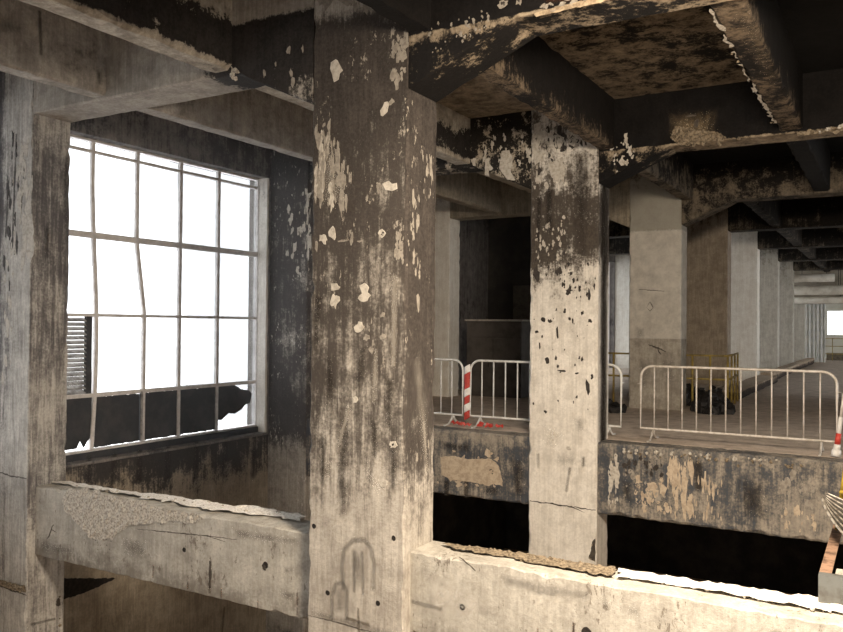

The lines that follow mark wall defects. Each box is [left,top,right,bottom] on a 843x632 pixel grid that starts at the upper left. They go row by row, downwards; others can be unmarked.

peeling [534,0,605,17]
peeling [330,59,343,82]
peeling [380,30,409,116]
spalling [709,9,777,123]
peeling [471,122,595,189]
peeling [610,133,634,173]
peeling [286,118,363,274]
peeling [394,150,433,276]
peeling [533,215,596,300]
peeling [358,283,371,302]
water stain [338,396,358,446]
water stain [694,462,702,489]